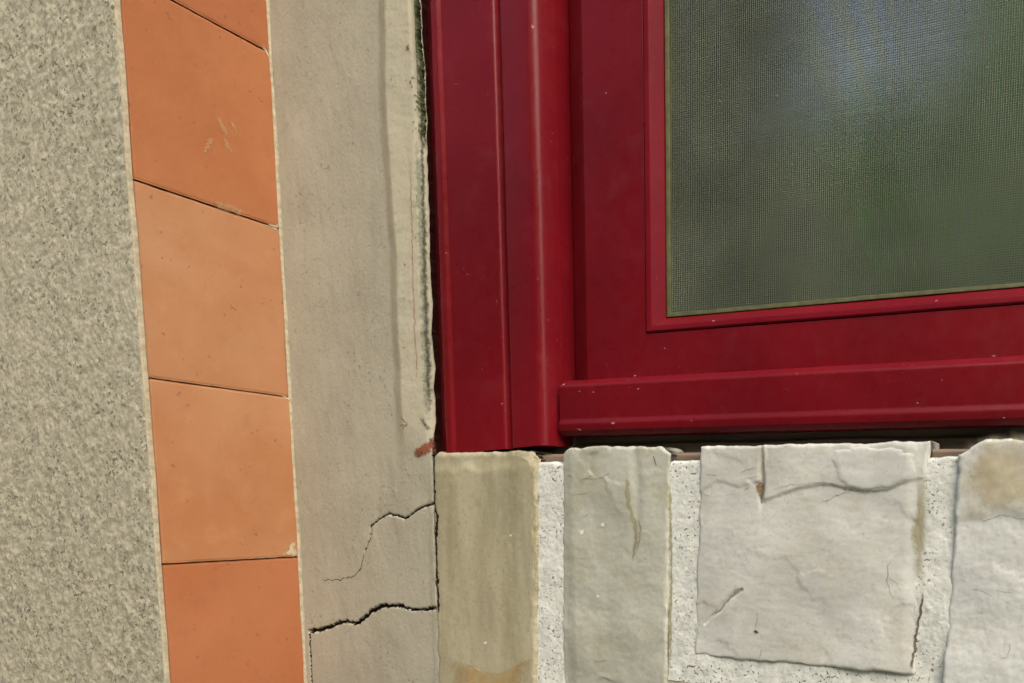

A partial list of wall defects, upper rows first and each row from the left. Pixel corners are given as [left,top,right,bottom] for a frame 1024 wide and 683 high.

damp [416,104,431,405]
crack [309,454,440,683]